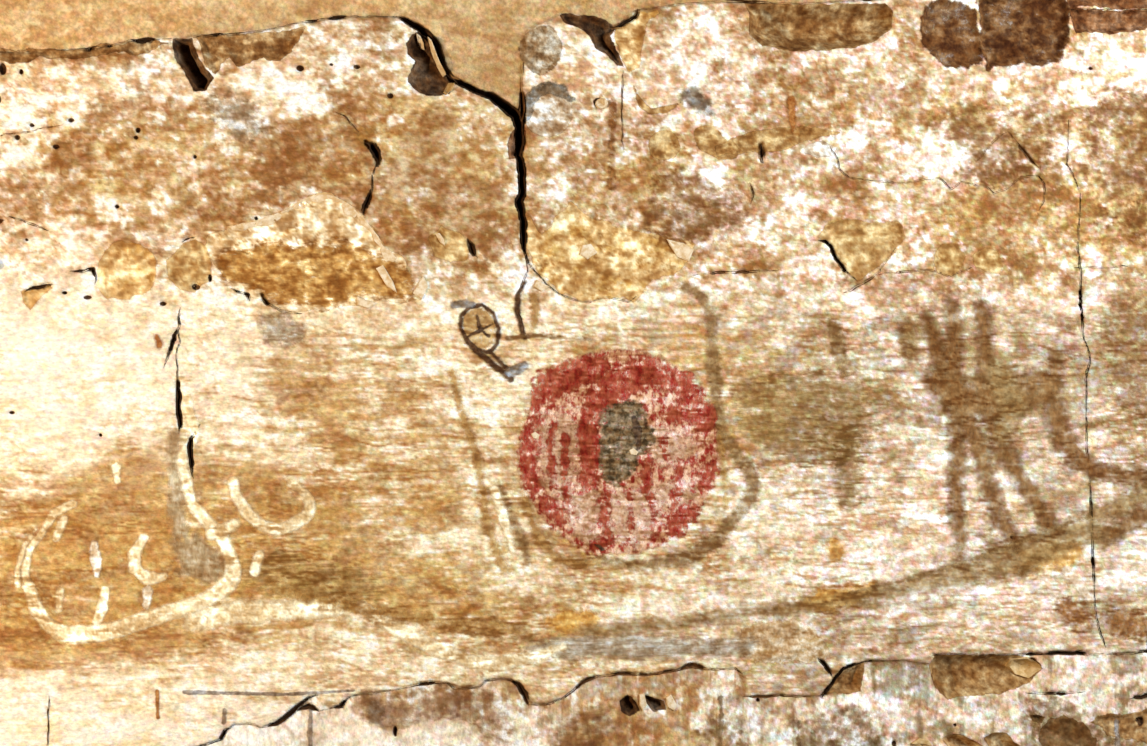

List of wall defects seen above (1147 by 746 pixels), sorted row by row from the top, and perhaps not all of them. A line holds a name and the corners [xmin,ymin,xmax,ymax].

hole [406,32,455,96]
spalling [745,3,893,52]
spalling [920,0,1147,72]
crack [5,15,635,322]
crack [936,120,1147,656]
crack [203,659,882,746]
spalling [911,723,1020,746]
spalling [929,654,1043,699]
spalling [1030,709,1147,746]